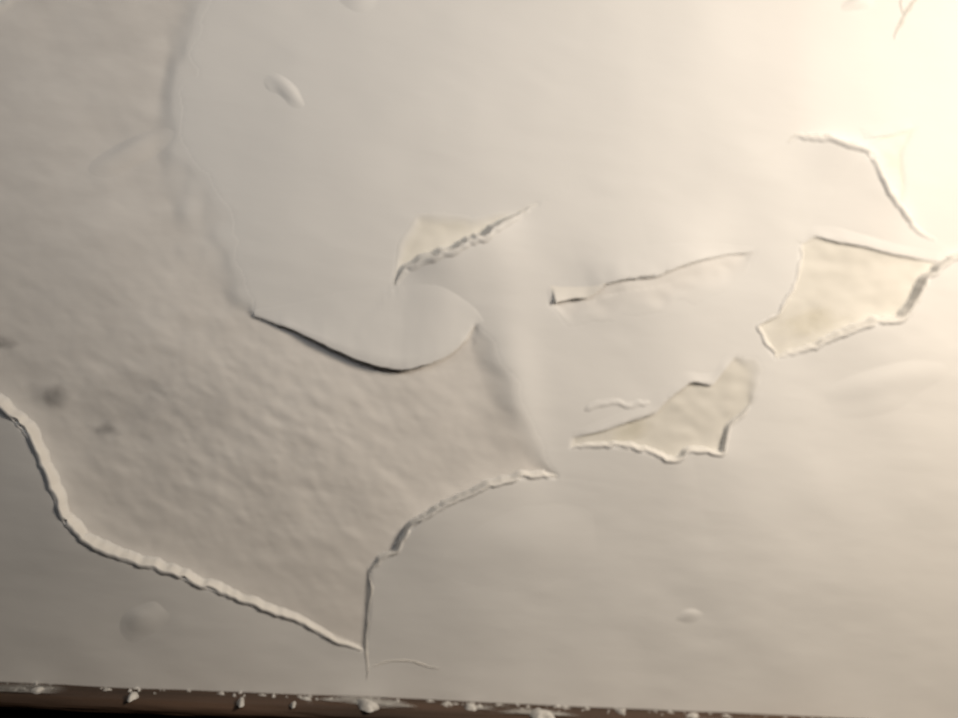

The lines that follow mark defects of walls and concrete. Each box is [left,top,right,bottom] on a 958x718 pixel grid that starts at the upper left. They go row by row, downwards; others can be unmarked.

peeling [0,0,558,651]
peeling [548,243,756,327]
peeling [570,351,763,464]
peeling [755,117,958,359]